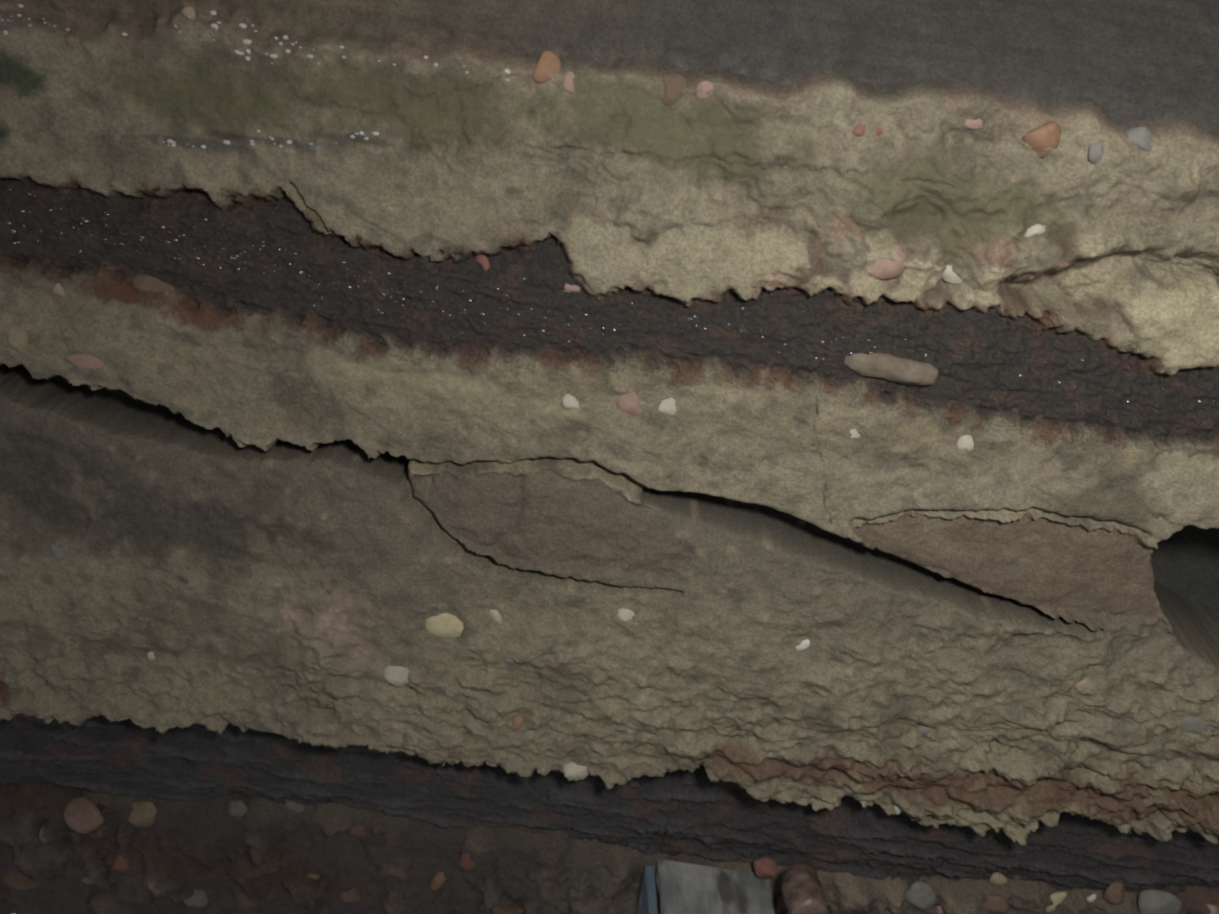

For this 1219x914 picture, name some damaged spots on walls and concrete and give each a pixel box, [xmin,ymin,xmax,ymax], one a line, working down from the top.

crack [290,184,326,225]
crack [0,364,1105,638]
spalling [1151,525,1219,664]
spalling [0,713,1219,914]